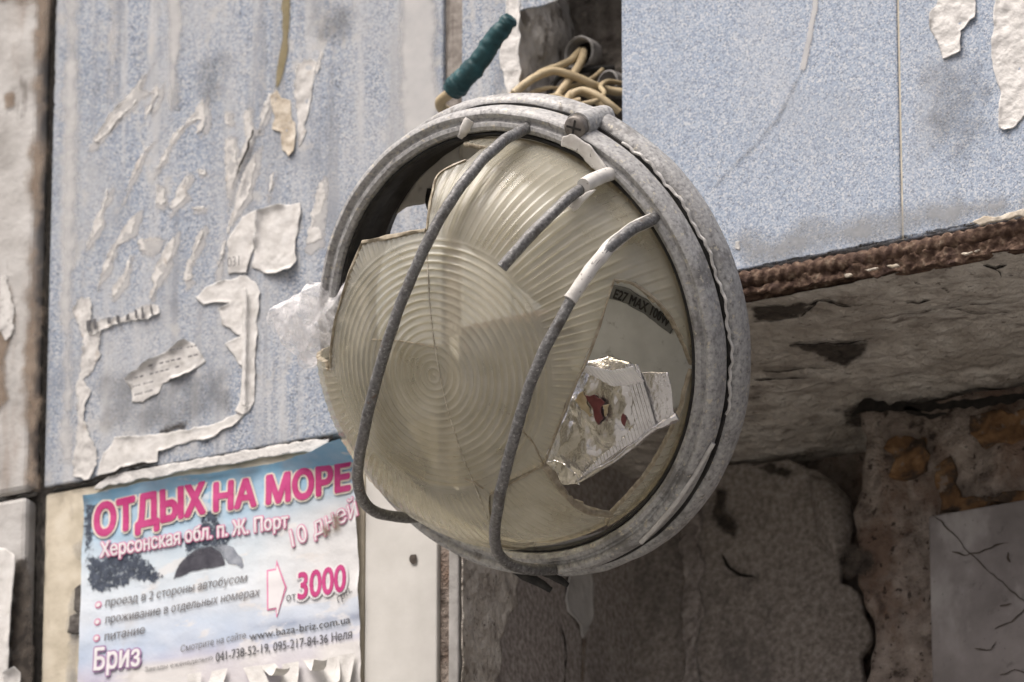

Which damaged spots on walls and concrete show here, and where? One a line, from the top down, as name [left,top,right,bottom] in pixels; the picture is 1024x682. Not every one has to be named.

peeling [929,0,976,59]
peeling [991,0,1024,130]
corrosion [739,209,1024,296]
corrosion [462,309,555,344]
spalling [790,340,869,366]
crack [933,515,1024,651]